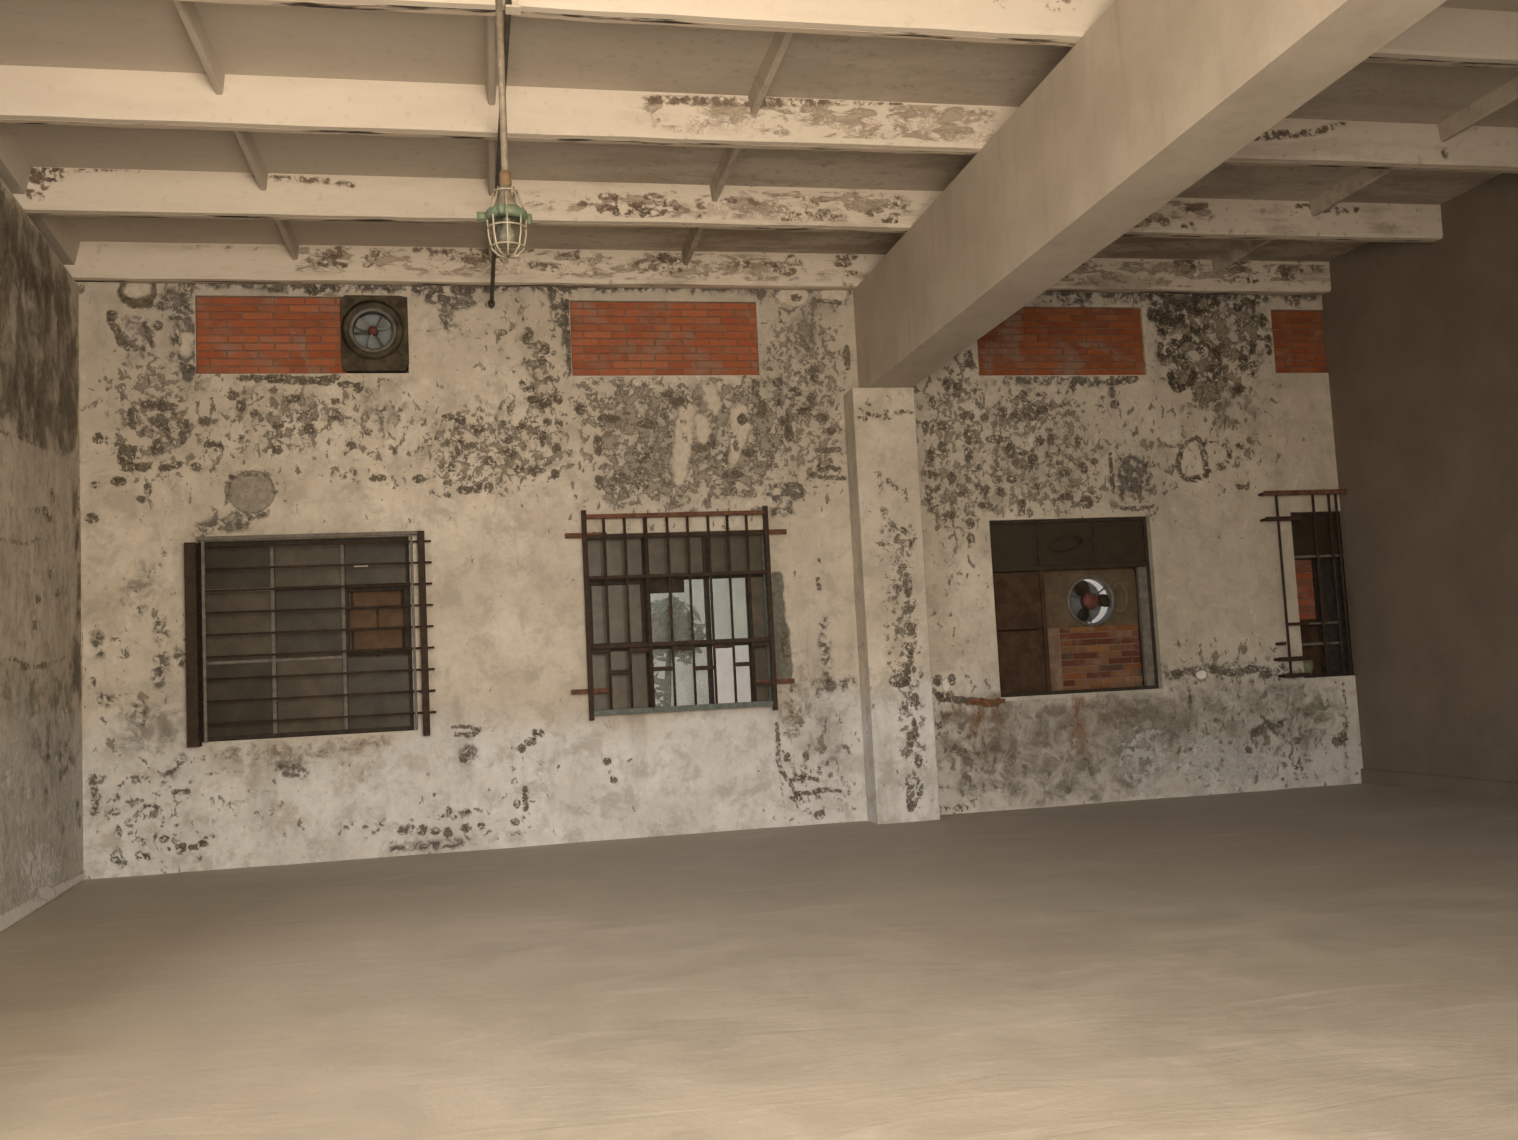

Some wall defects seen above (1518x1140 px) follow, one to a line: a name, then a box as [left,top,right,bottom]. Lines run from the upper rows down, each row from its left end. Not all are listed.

peeling [643,96,995,142]
peeling [572,191,910,223]
peeling [1134,201,1212,228]
peeling [1061,260,1324,287]
water stain [0,185,78,452]
peeling [92,283,386,503]
peeling [877,508,1002,812]
peeling [1165,664,1303,684]
spalling [451,724,481,763]
peeling [88,774,125,868]
peeling [159,835,214,855]
peeling [343,806,485,851]